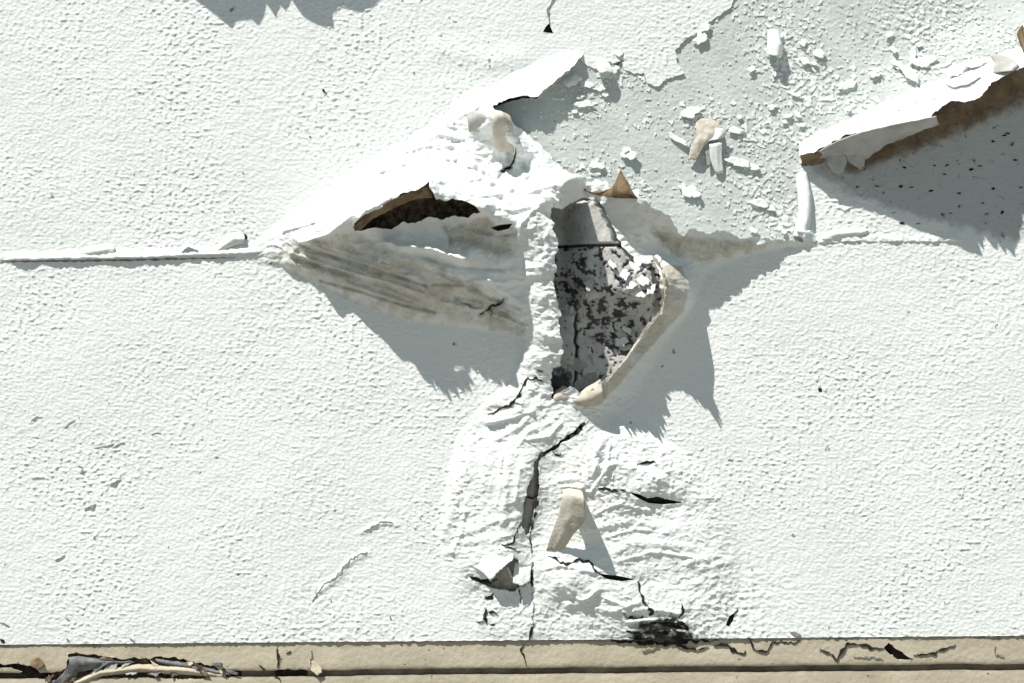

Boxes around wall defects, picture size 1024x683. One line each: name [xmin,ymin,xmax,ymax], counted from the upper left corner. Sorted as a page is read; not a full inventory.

peeling [494,0,1024,250]
leakage [293,244,493,314]
spalling [550,197,662,399]
crack [487,371,543,415]
crack [598,487,682,504]
crack [470,422,649,667]
leakage [624,603,697,643]
spalling [0,638,239,683]